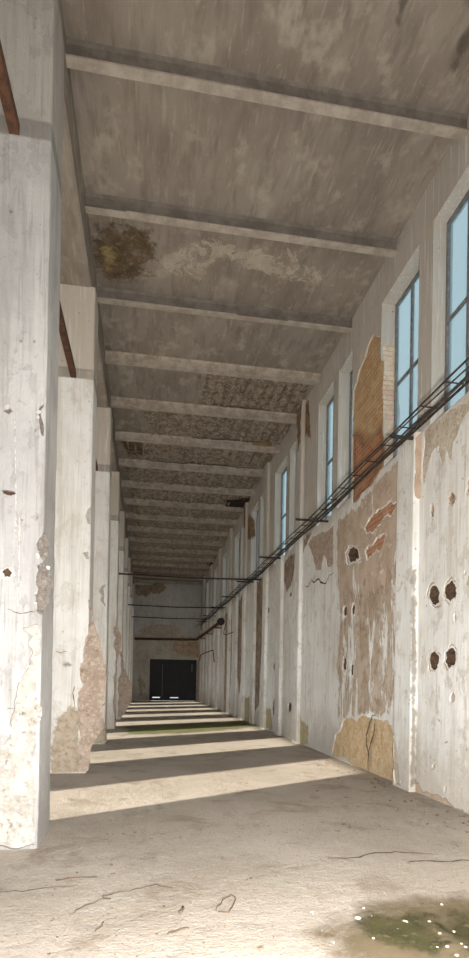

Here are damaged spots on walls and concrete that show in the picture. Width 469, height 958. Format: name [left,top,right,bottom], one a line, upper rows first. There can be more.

leakage [93,222,335,288]
peeling [423,401,469,483]
peeling [308,336,401,785]
spalling [0,530,54,848]
spalling [74,585,131,772]
crack [342,851,469,863]
leakage [316,899,469,958]